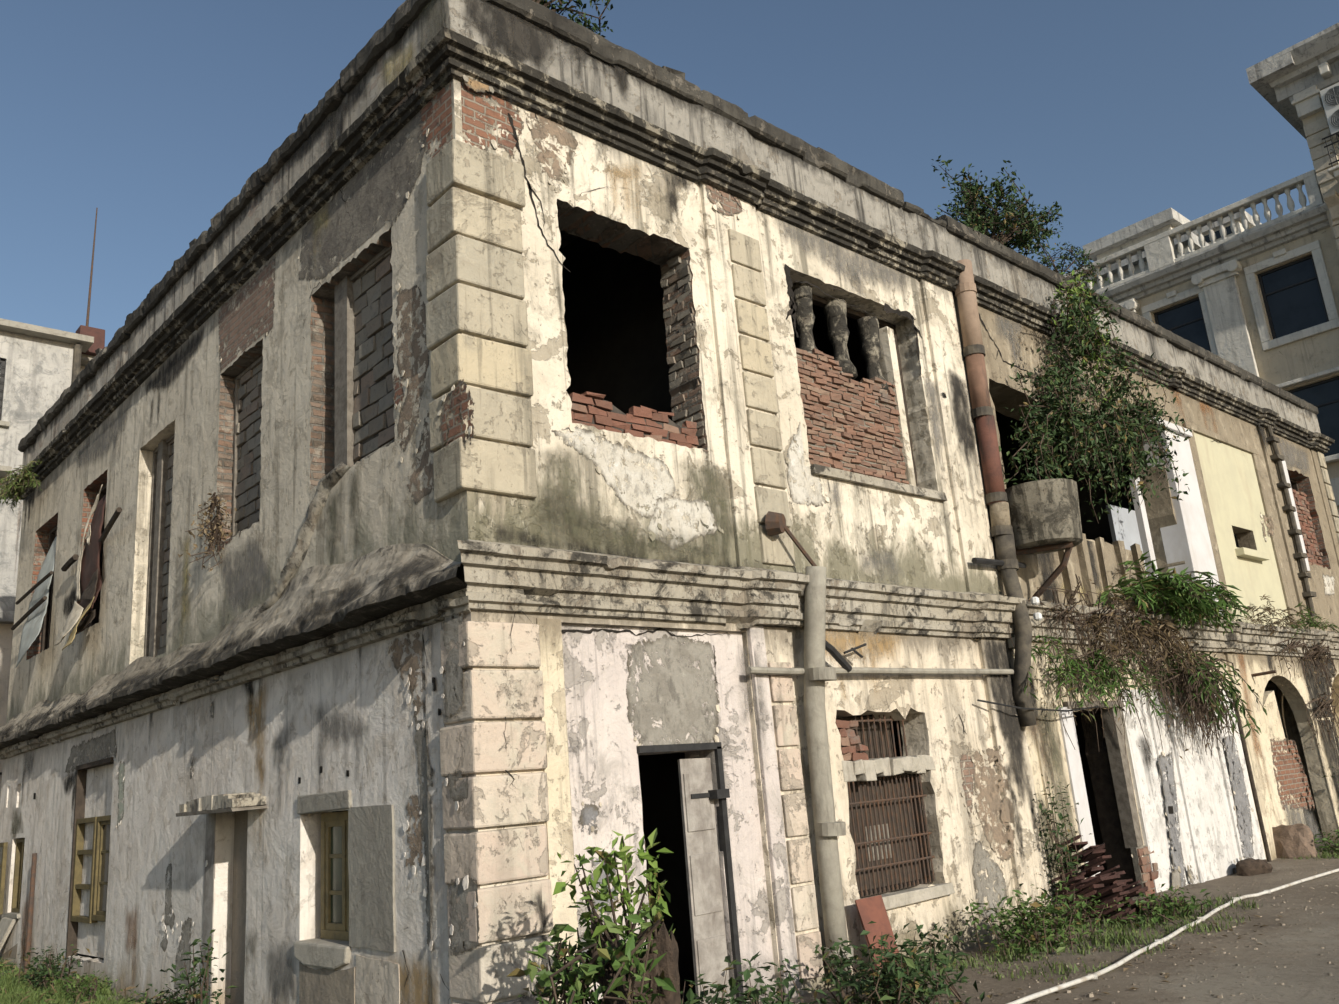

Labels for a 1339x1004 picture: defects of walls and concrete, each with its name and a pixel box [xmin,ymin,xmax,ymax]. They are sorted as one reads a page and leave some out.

flaking render [298,75,578,281]
crack [508,113,645,272]
water stain [146,328,204,416]
flaking render [217,256,275,371]
flaking render [393,283,475,505]
water stain [500,455,636,558]
flaking render [552,424,724,553]
water stain [688,467,731,540]
flaking render [385,611,480,955]
flaking render [160,863,194,990]